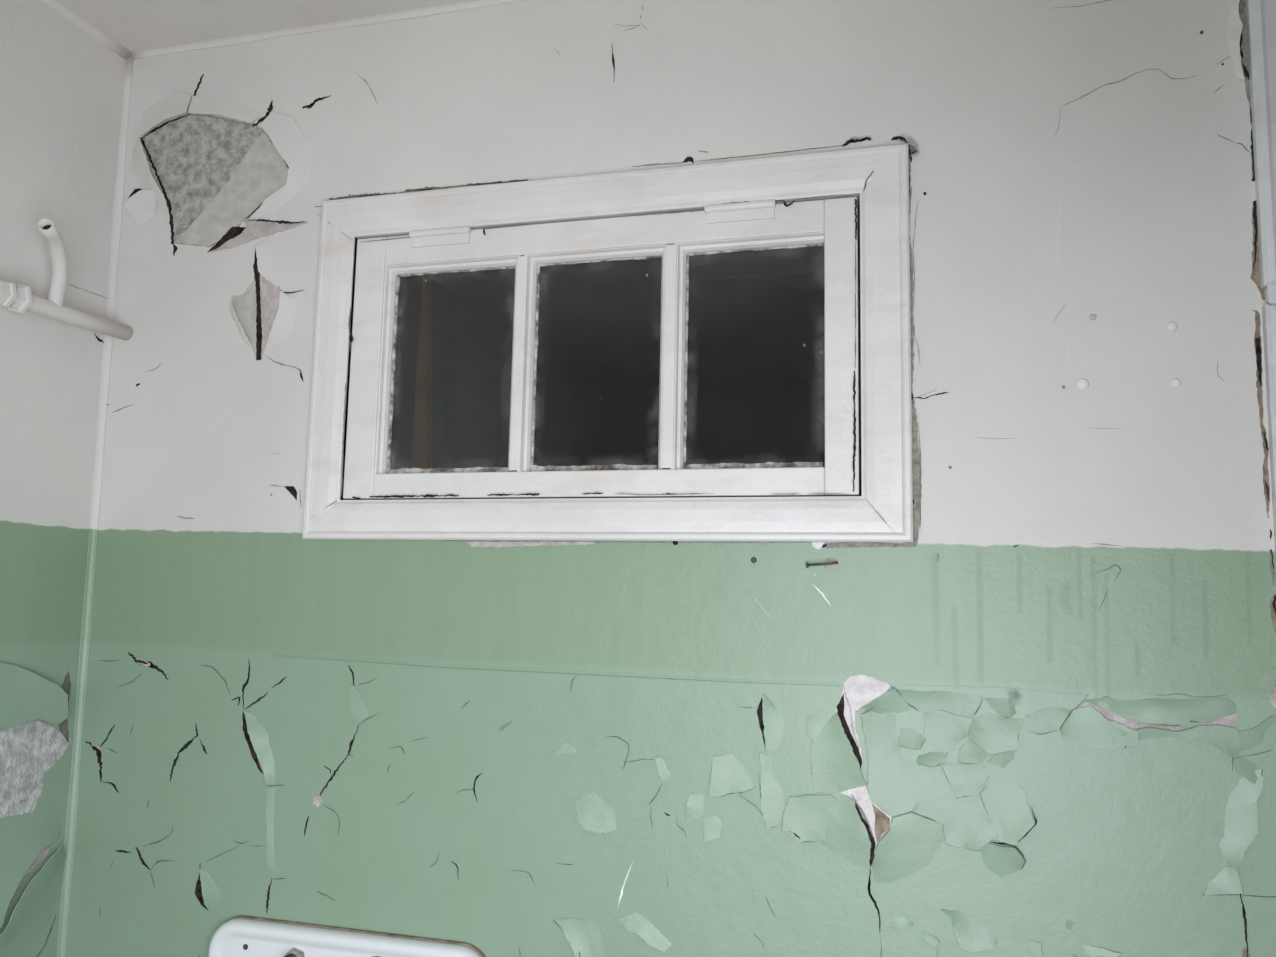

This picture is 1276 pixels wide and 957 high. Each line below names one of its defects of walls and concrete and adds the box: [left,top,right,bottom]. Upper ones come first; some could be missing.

peeling [124,74,528,382]
spalling [324,383,459,509]
crack [98,652,169,687]
peeling [0,662,72,957]
crack [85,725,133,793]
crack [147,723,207,808]
crack [109,827,248,888]
crack [304,666,381,836]
crack [454,773,482,800]
crack [608,736,671,824]
peeling [664,675,1241,957]
peeling [1205,769,1276,957]